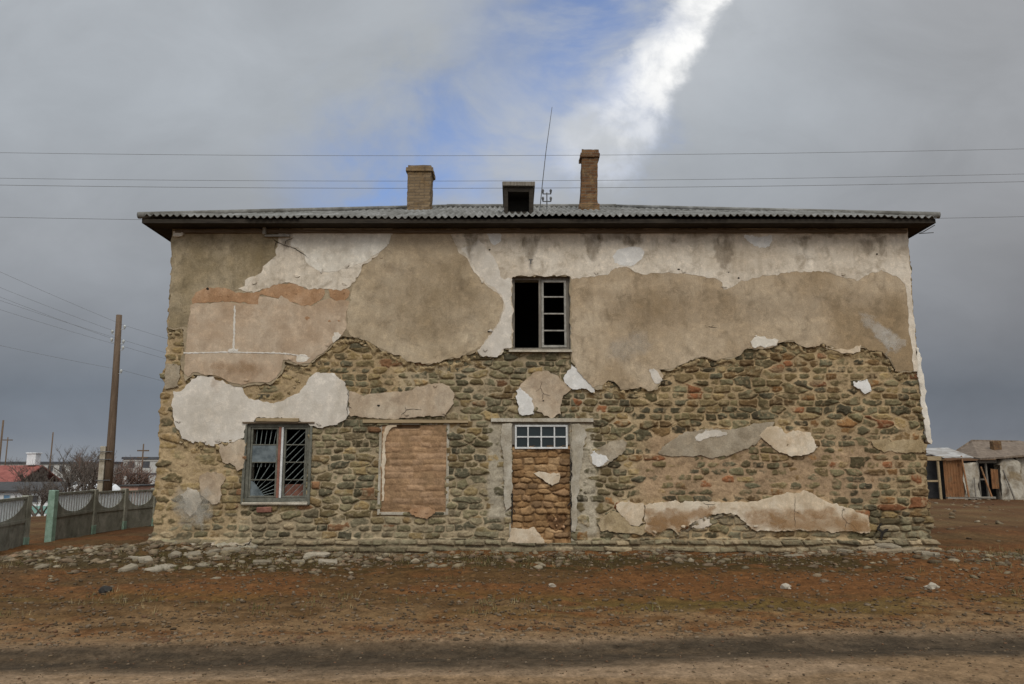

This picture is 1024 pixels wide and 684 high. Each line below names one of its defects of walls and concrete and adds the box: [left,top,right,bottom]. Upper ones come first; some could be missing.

spalling [164,228,932,516]
spalling [409,507,435,519]
peeling [598,490,871,538]